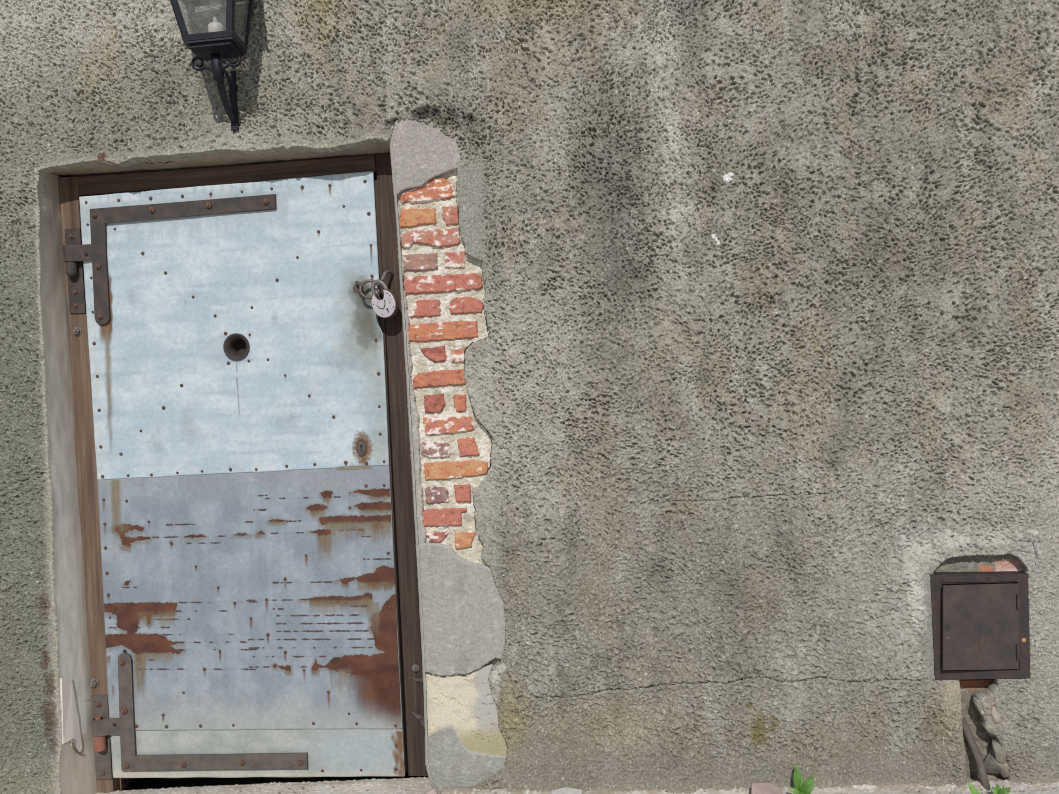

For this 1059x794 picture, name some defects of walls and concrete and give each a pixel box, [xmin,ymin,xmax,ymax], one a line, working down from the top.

corrosion [101,280,112,419]
flaking render [395,170,492,565]
corrosion [103,481,150,548]
corrosion [307,488,391,545]
corrosion [104,602,184,675]
corrosion [300,565,401,715]
flaking render [425,663,507,756]